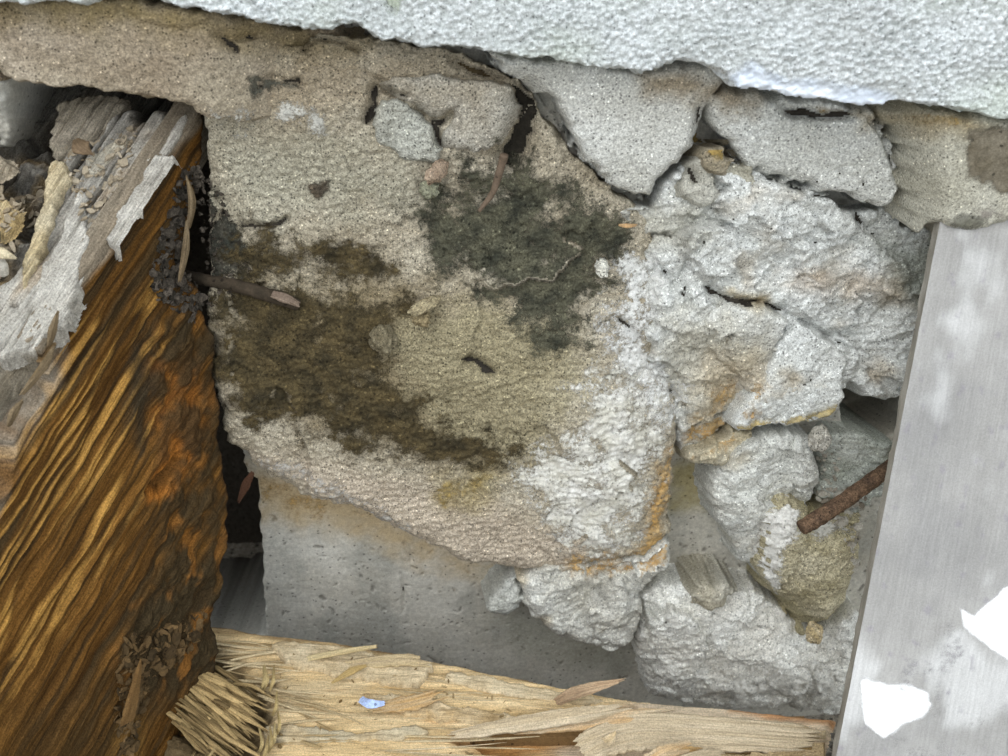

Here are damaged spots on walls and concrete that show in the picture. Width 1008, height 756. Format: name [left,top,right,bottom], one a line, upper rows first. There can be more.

crack [221,35,253,53]
crack [458,62,490,77]
crack [365,86,404,124]
crack [432,118,445,145]
crack [504,86,538,164]
crack [785,108,850,119]
crack [687,168,698,183]
crack [241,217,286,228]
spalling [620,161,932,450]
leakage [208,138,691,565]
peeling [480,564,524,615]